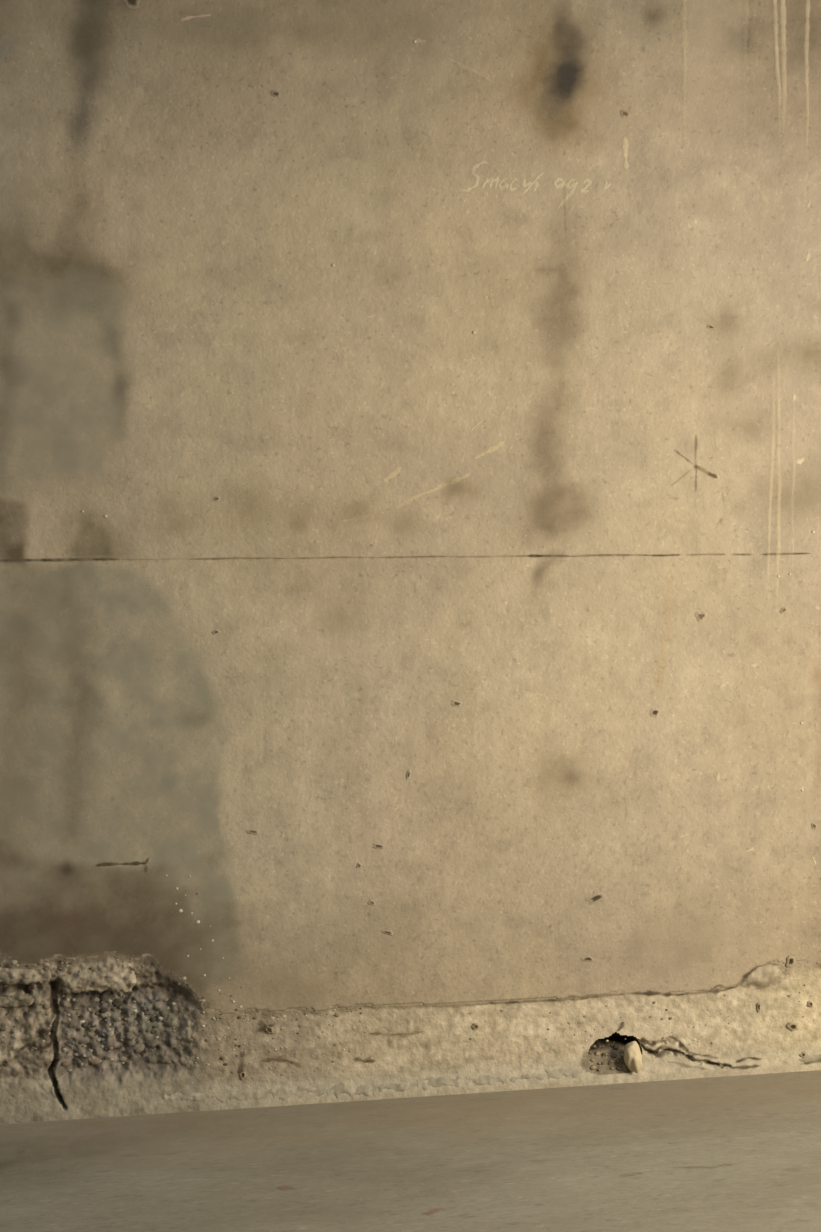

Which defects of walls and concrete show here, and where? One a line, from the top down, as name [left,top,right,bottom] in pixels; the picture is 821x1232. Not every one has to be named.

damp [773,0,785,70]
damp [536,50,580,132]
damp [0,513,24,562]
damp [0,524,240,995]
crack [21,999,61,1099]
spalling [0,945,821,1124]
crack [642,1040,761,1069]